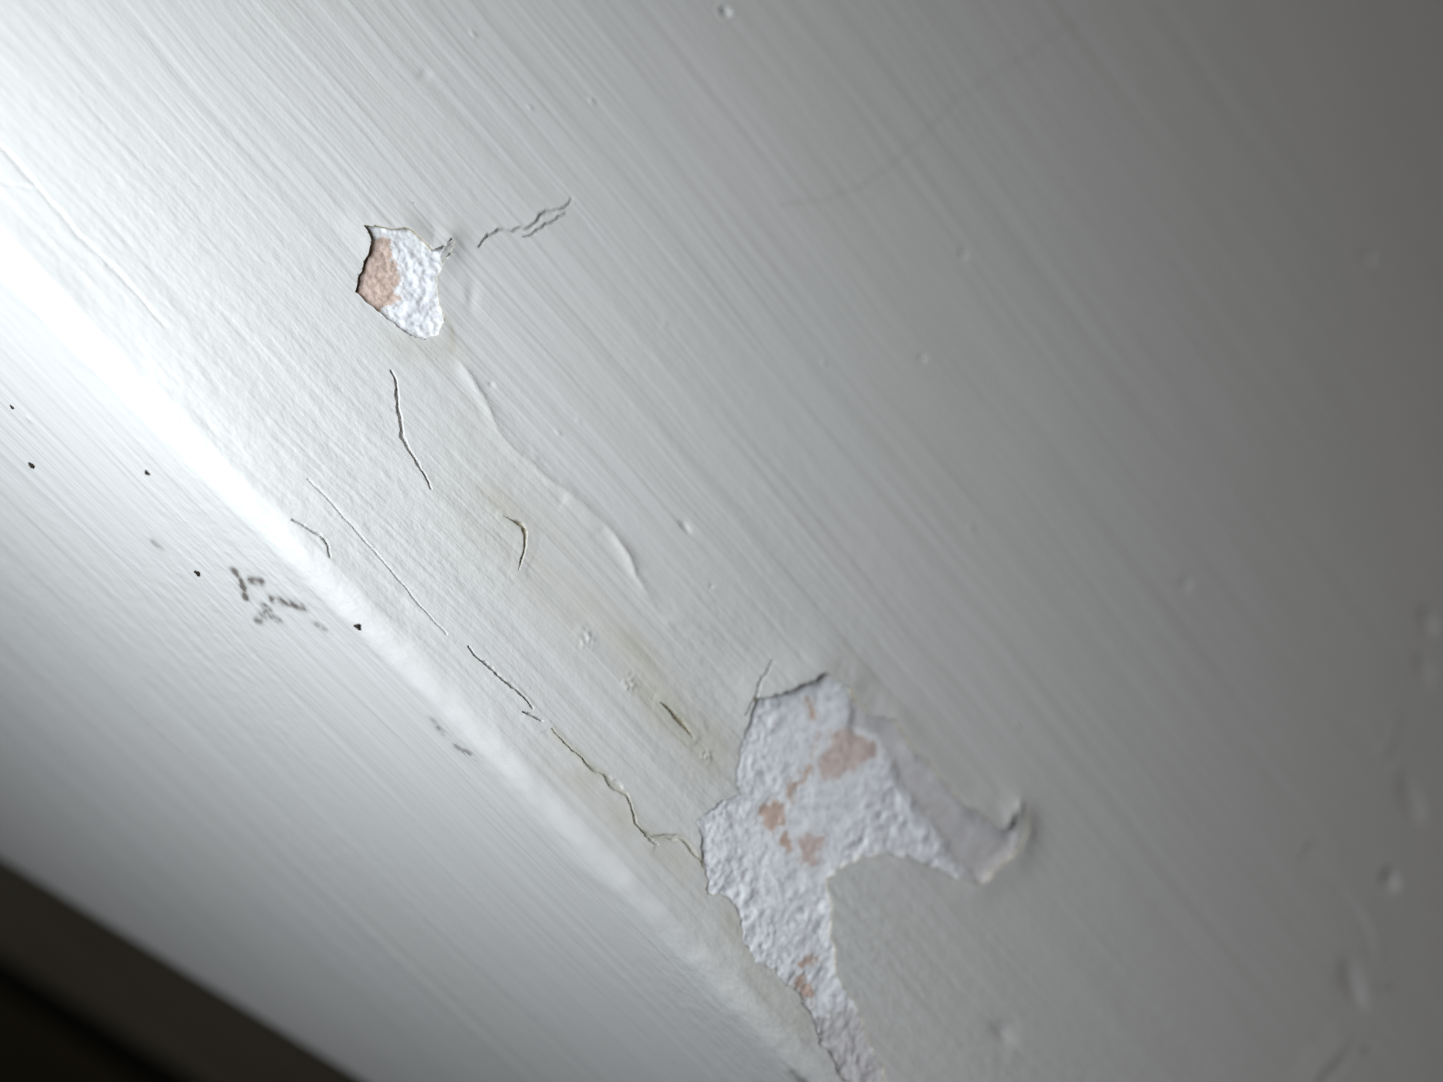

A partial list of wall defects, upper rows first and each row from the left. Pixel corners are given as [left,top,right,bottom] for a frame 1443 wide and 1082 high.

peeling [337,193,474,357]
crack [467,185,585,261]
crack [376,357,446,502]
crack [278,465,708,879]
peeling [650,691,703,747]
peeling [677,615,1046,1082]